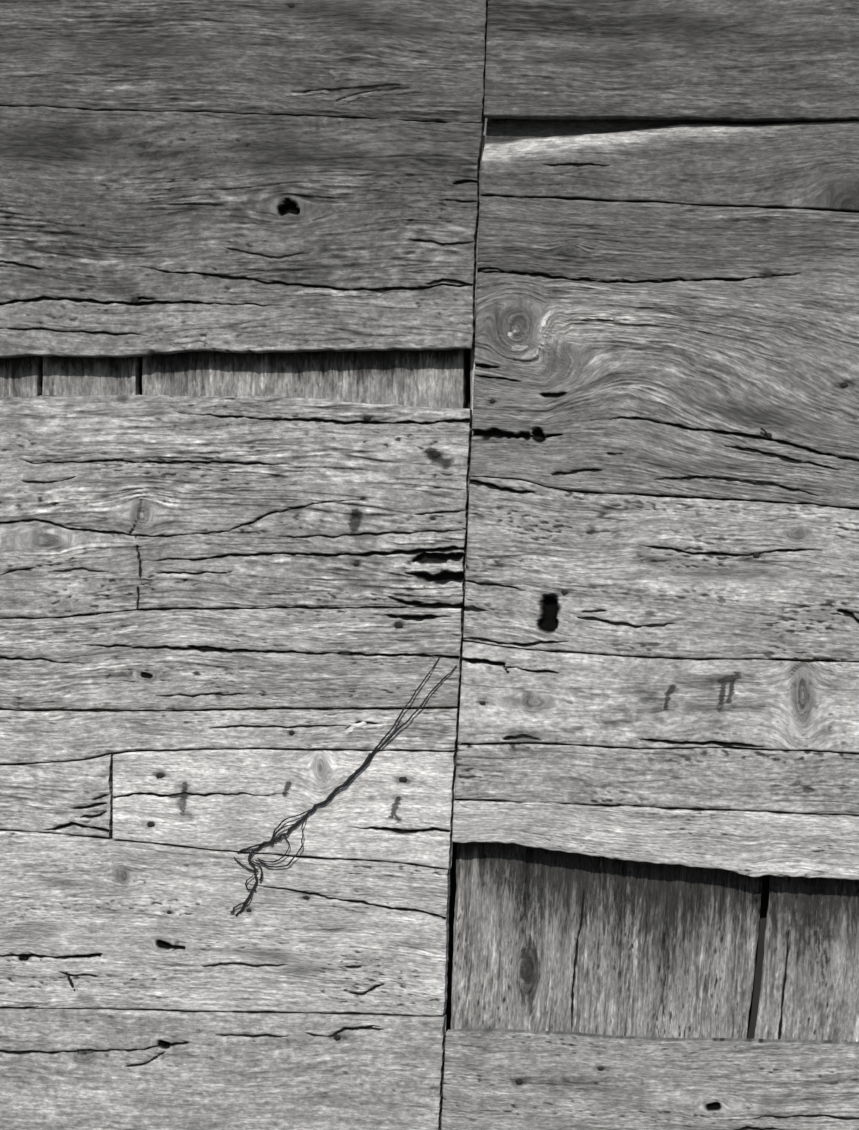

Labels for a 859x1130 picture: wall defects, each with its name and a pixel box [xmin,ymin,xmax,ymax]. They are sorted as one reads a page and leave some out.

crack [444,180,478,203]
crack [0,239,800,336]
crack [0,452,675,673]
crack [0,953,102,991]
crack [203,960,288,968]
crack [345,965,384,995]
crack [219,1025,384,1038]
crack [0,1042,189,1067]